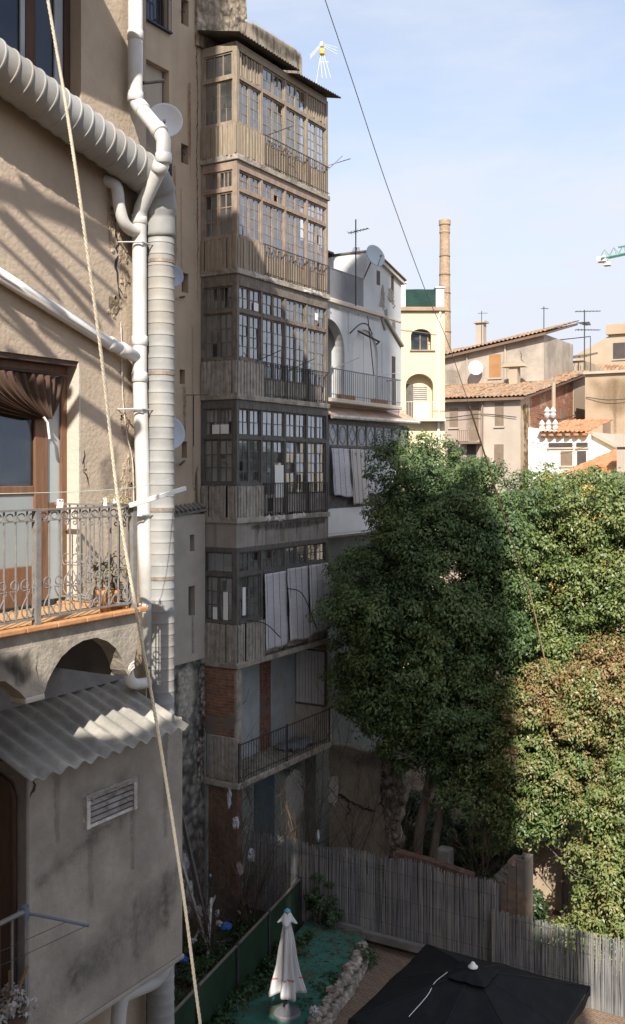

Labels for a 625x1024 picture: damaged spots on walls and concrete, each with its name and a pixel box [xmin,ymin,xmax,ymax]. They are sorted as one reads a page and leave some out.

spalling [107,205,130,319]
crack [339,764,387,822]